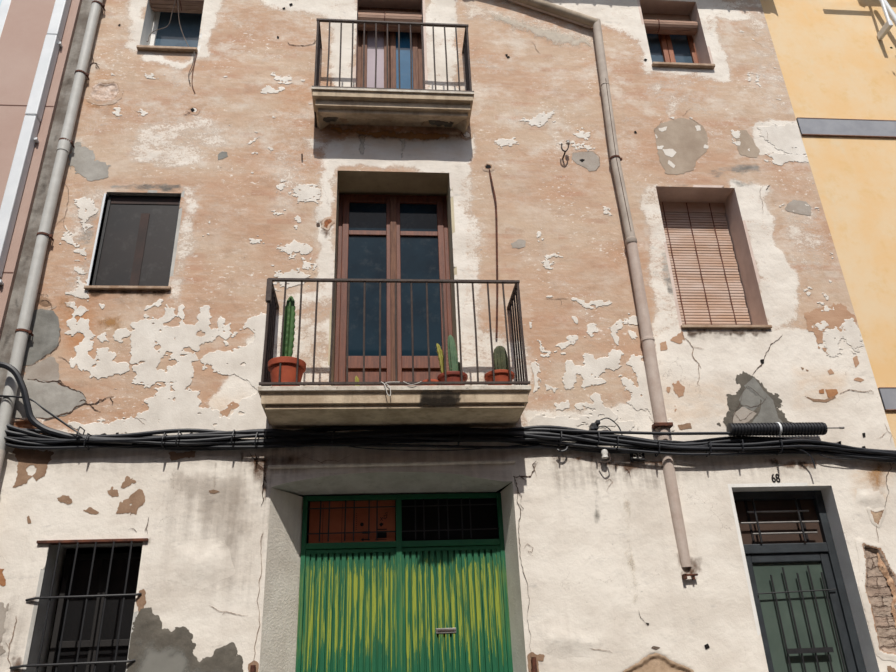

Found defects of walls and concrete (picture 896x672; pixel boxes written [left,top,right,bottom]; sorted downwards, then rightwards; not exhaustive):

peeling [271,215,335,291]
crack [15,331,114,420]
peeling [35,197,273,436]
peeling [529,313,655,432]
peeling [660,331,685,351]
peeling [666,381,685,397]
crack [732,336,782,423]
peeling [12,448,54,488]
peeling [107,476,145,515]
crack [513,461,536,650]
spalling [855,507,896,672]
spalling [623,646,694,672]